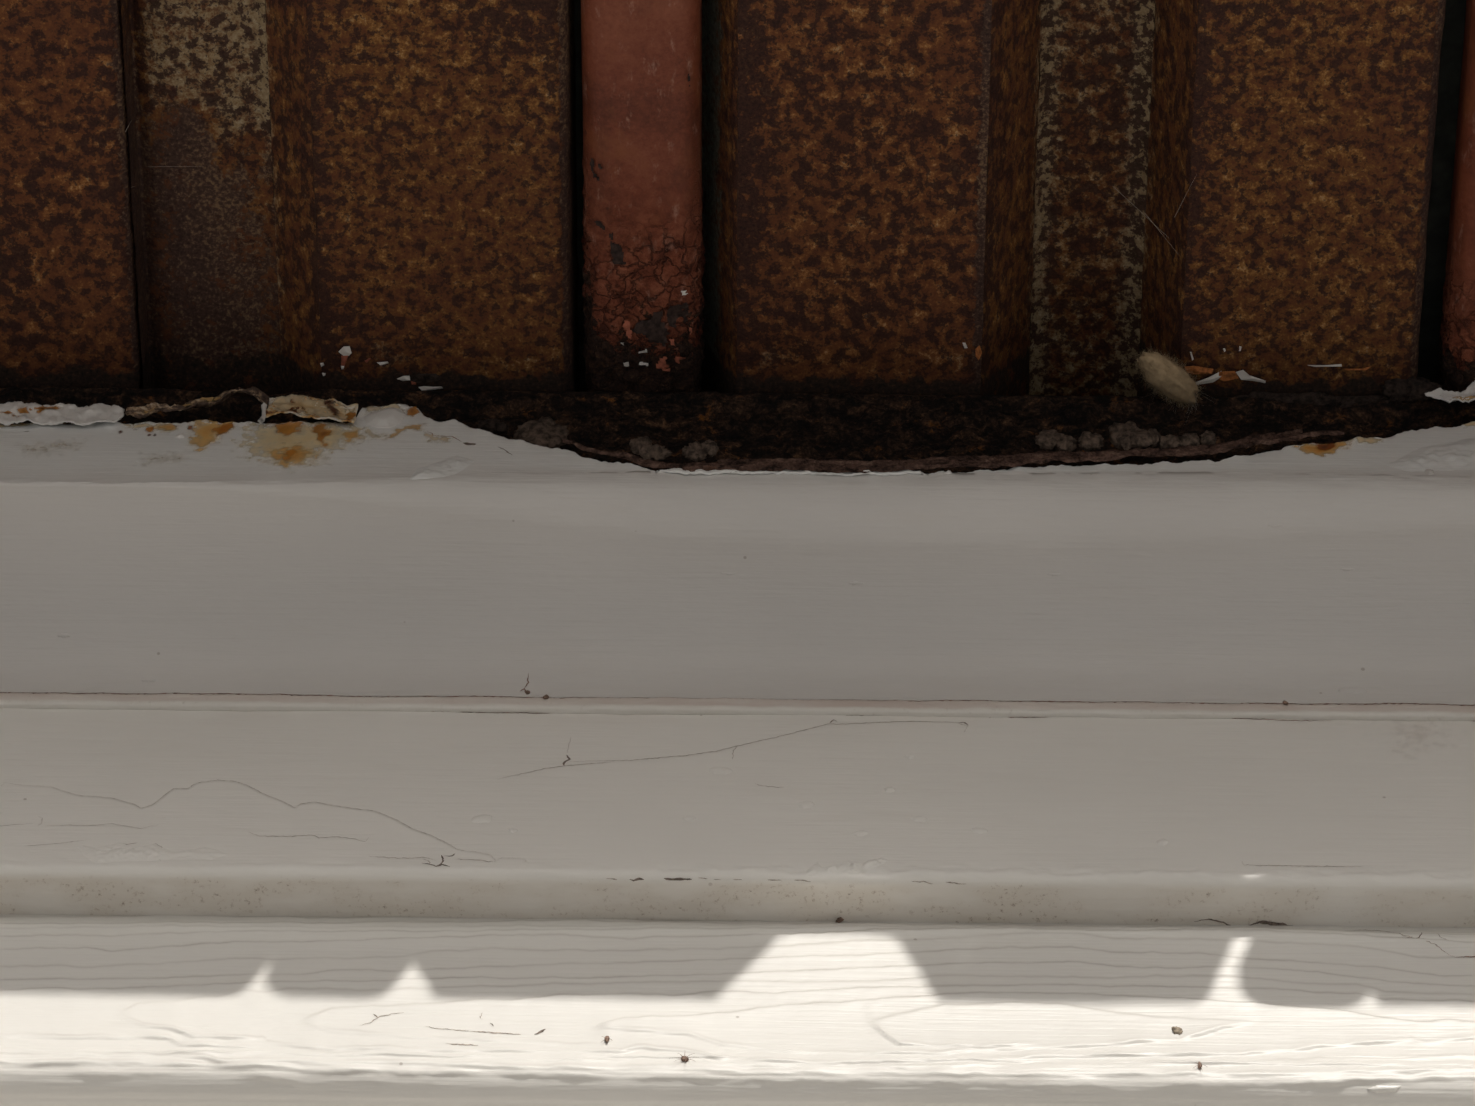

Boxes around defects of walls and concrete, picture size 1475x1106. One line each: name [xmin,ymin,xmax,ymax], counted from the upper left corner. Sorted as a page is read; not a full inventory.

peeling [594,220,626,265]
peeling [621,290,692,372]
peeling [320,346,443,390]
peeling [1185,352,1266,385]
peeling [0,386,419,426]
peeling [1424,381,1475,403]
corrosion [119,420,449,466]
crack [0,692,1474,778]
crack [3,780,526,867]